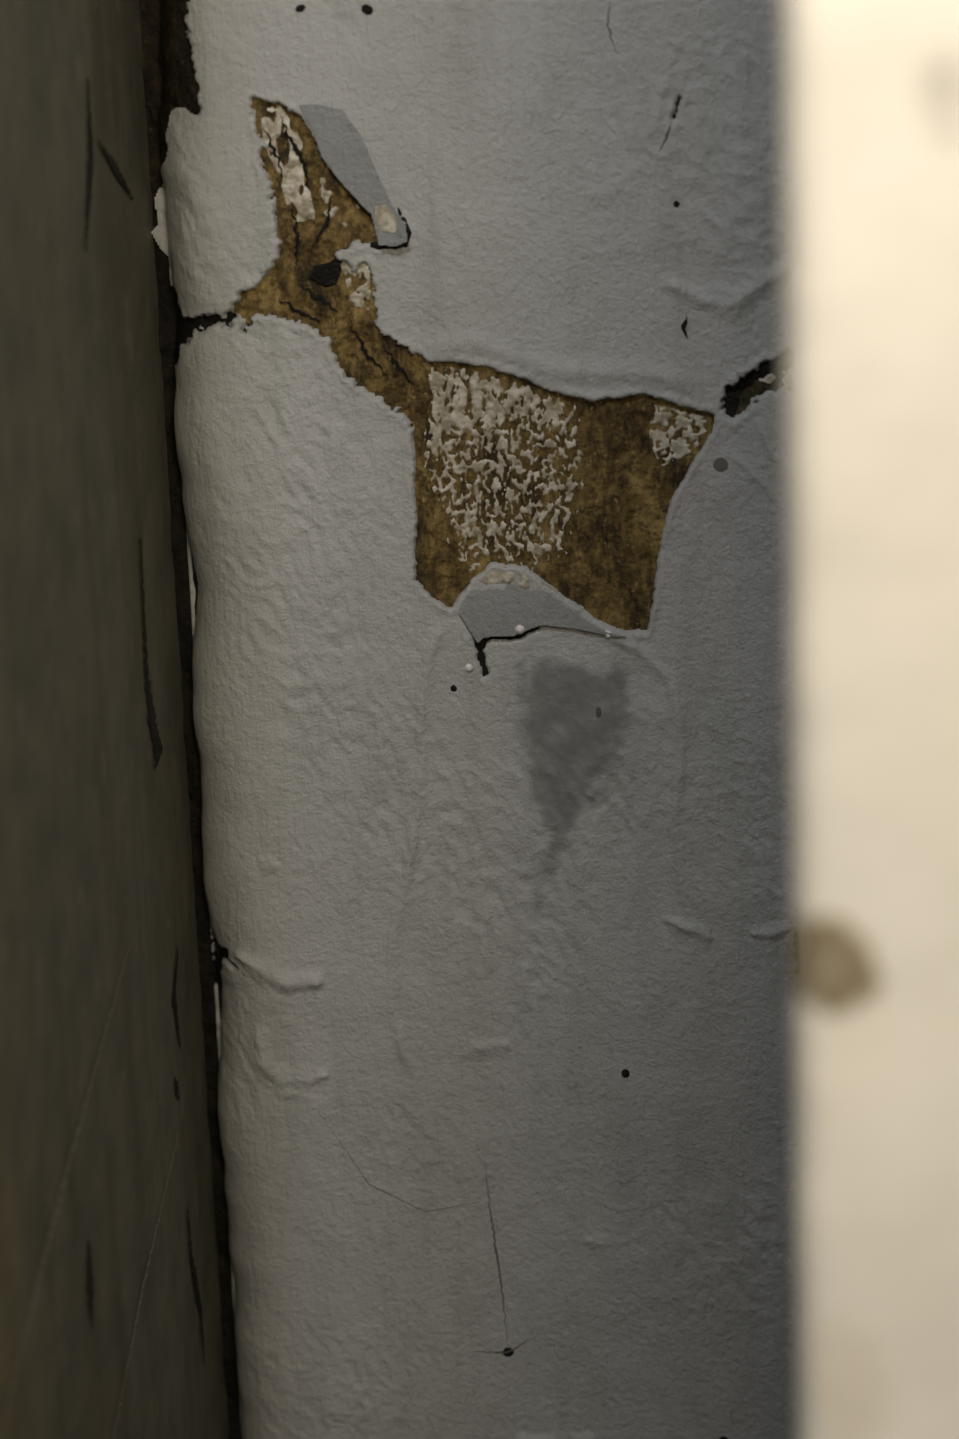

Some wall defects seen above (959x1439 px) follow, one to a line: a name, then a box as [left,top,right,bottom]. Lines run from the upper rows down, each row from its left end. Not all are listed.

crack [85,78,134,251]
spalling [139,0,201,225]
peeling [234,96,714,677]
spalling [713,458,728,472]
crack [140,229,253,1439]
crack [86,1240,94,1328]